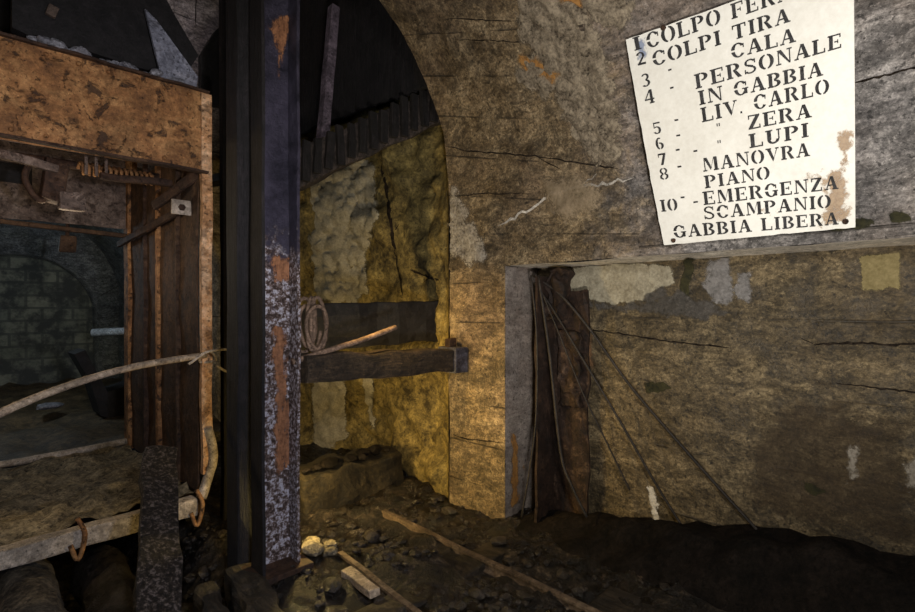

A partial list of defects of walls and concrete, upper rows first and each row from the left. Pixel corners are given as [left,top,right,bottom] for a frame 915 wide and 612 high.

corrosion [271,15,289,64]
spalling [514,0,635,166]
crack [381,165,441,295]
peeling [566,262,675,305]
peeling [702,257,752,304]
crack [801,338,915,347]
corrosion [271,326,290,475]